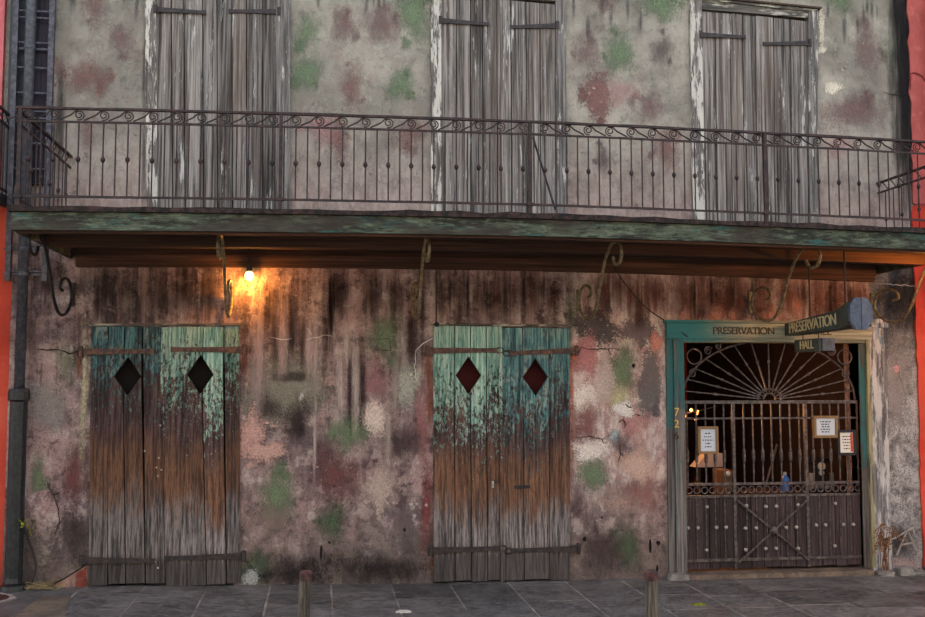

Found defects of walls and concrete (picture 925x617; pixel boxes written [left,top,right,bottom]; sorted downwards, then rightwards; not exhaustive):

damp [818,6,829,54]
damp [578,42,614,124]
damp [820,81,880,124]
damp [95,268,215,316]
damp [402,286,424,357]
damp [242,283,344,466]
damp [338,331,365,410]
damp [386,421,420,463]
damp [264,559,323,585]
damp [337,555,420,584]